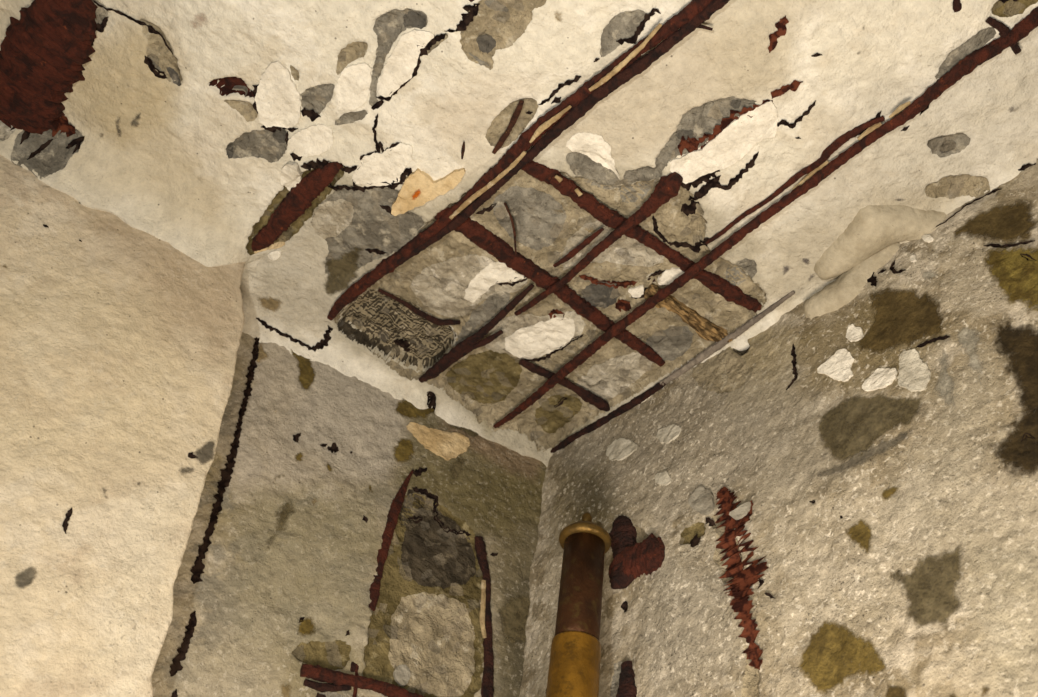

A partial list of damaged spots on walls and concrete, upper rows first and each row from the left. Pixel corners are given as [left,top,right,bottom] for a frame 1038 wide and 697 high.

rust [0,0,98,135]
crack [250,4,480,215]
crack [526,8,661,114]
spalling [224,0,778,452]
rust [327,0,1038,453]
damp [955,201,1038,310]
crack [190,318,333,584]
peeling [406,422,470,461]
damp [995,322,1038,475]
spalling [362,488,484,697]
rust [608,515,665,589]
damp [800,622,886,693]